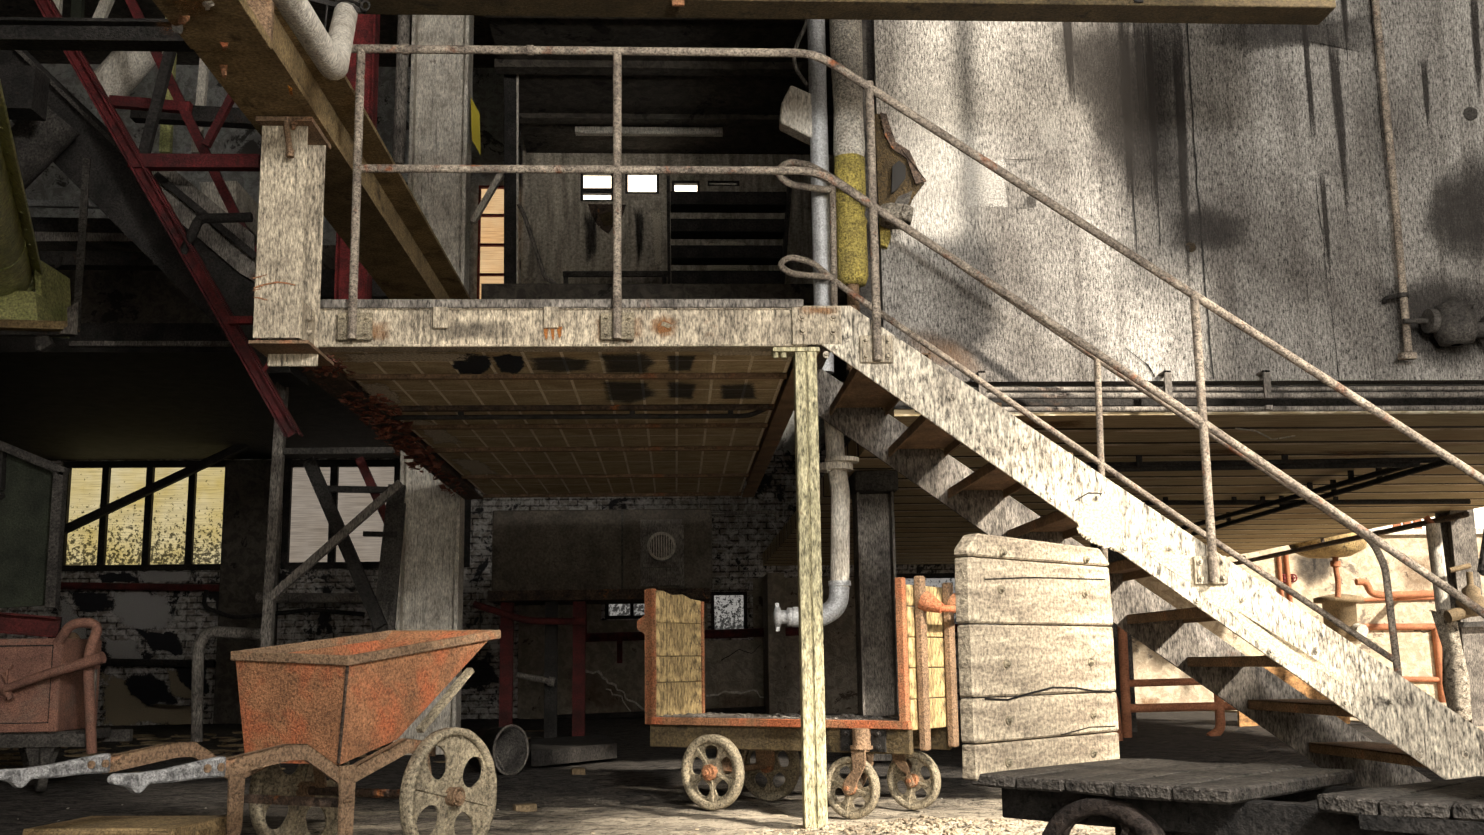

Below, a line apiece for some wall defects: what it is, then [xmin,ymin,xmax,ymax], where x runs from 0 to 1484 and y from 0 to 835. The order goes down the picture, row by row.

leakage [1064,22,1072,91]
leakage [1173,29,1190,278]
leakage [1304,43,1316,128]
leakage [1320,177,1331,271]
leakage [1329,0,1348,211]
peeling [58,570,210,726]